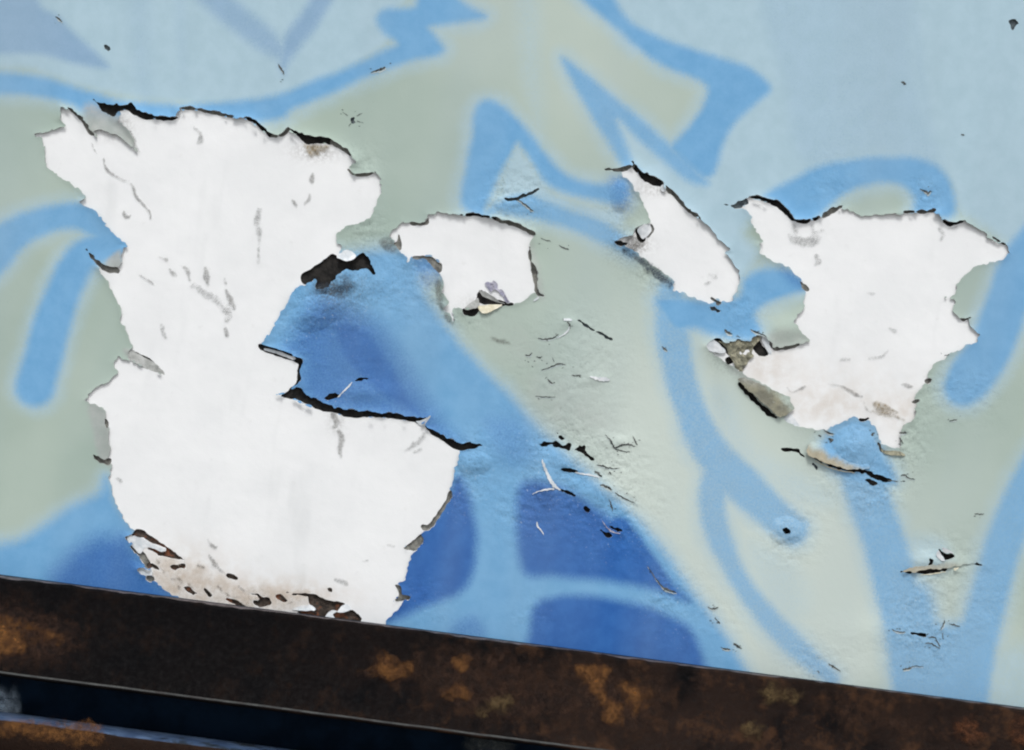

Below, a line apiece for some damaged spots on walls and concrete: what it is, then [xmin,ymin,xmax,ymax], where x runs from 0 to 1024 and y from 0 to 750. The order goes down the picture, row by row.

peeling [389,212,544,321]
peeling [605,161,740,313]
peeling [35,99,482,624]
peeling [706,195,1009,486]
rust [226,588,362,621]
peeling [903,547,982,573]
rust [0,691,103,742]